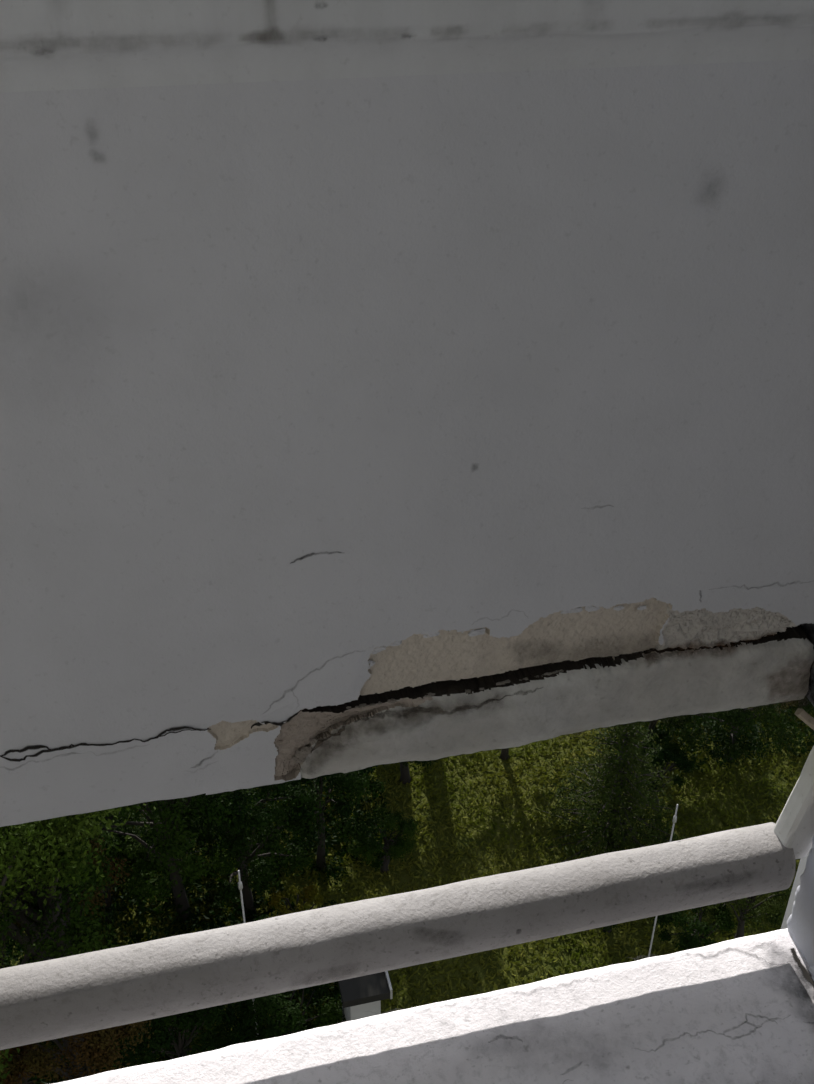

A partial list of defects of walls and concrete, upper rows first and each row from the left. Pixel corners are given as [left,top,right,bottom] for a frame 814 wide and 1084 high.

leakage [802,623,814,648]
flaking render [207,597,672,781]
crack [0,726,211,762]